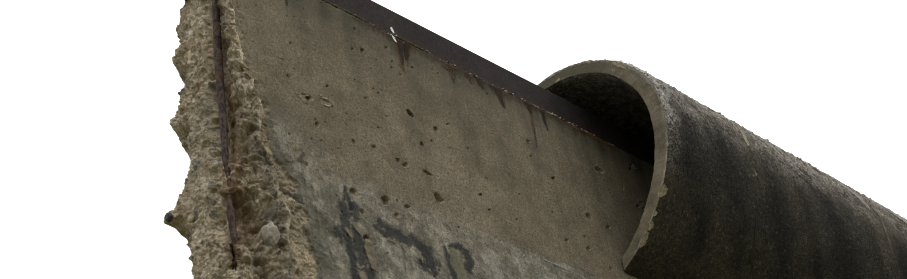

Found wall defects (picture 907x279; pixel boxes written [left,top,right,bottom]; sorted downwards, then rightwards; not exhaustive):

spalling [163,0,303,279]